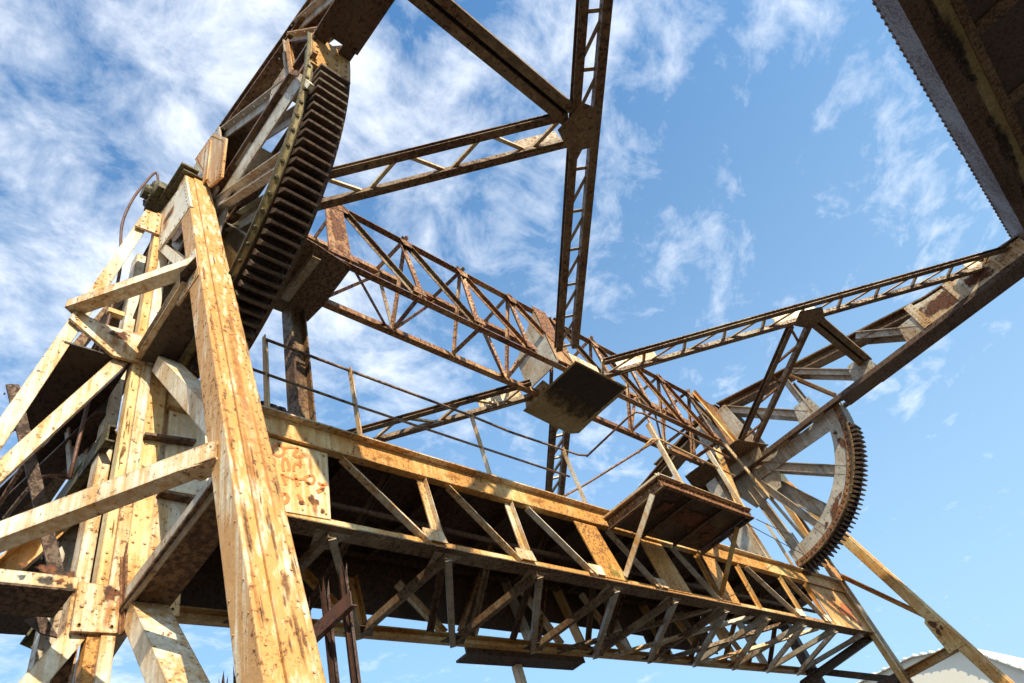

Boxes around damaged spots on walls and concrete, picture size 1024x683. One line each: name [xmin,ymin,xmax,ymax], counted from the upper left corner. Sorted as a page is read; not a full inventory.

corrosion [329,206,344,251]
corrosion [962,266,994,287]
corrosion [918,290,958,318]
corrosion [299,482,325,513]
corrosion [825,492,842,529]